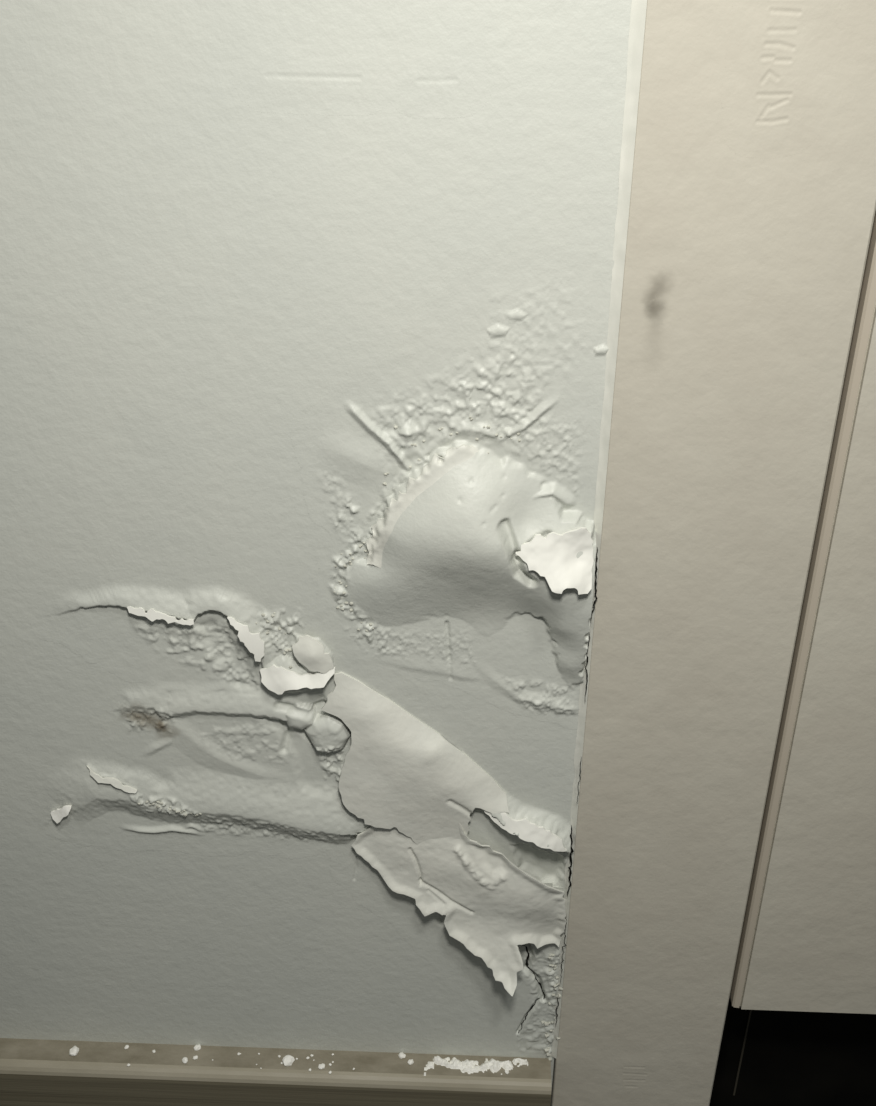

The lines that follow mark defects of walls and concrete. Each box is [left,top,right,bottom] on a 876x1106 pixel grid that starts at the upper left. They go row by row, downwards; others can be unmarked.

peeling [28,577,572,1061]